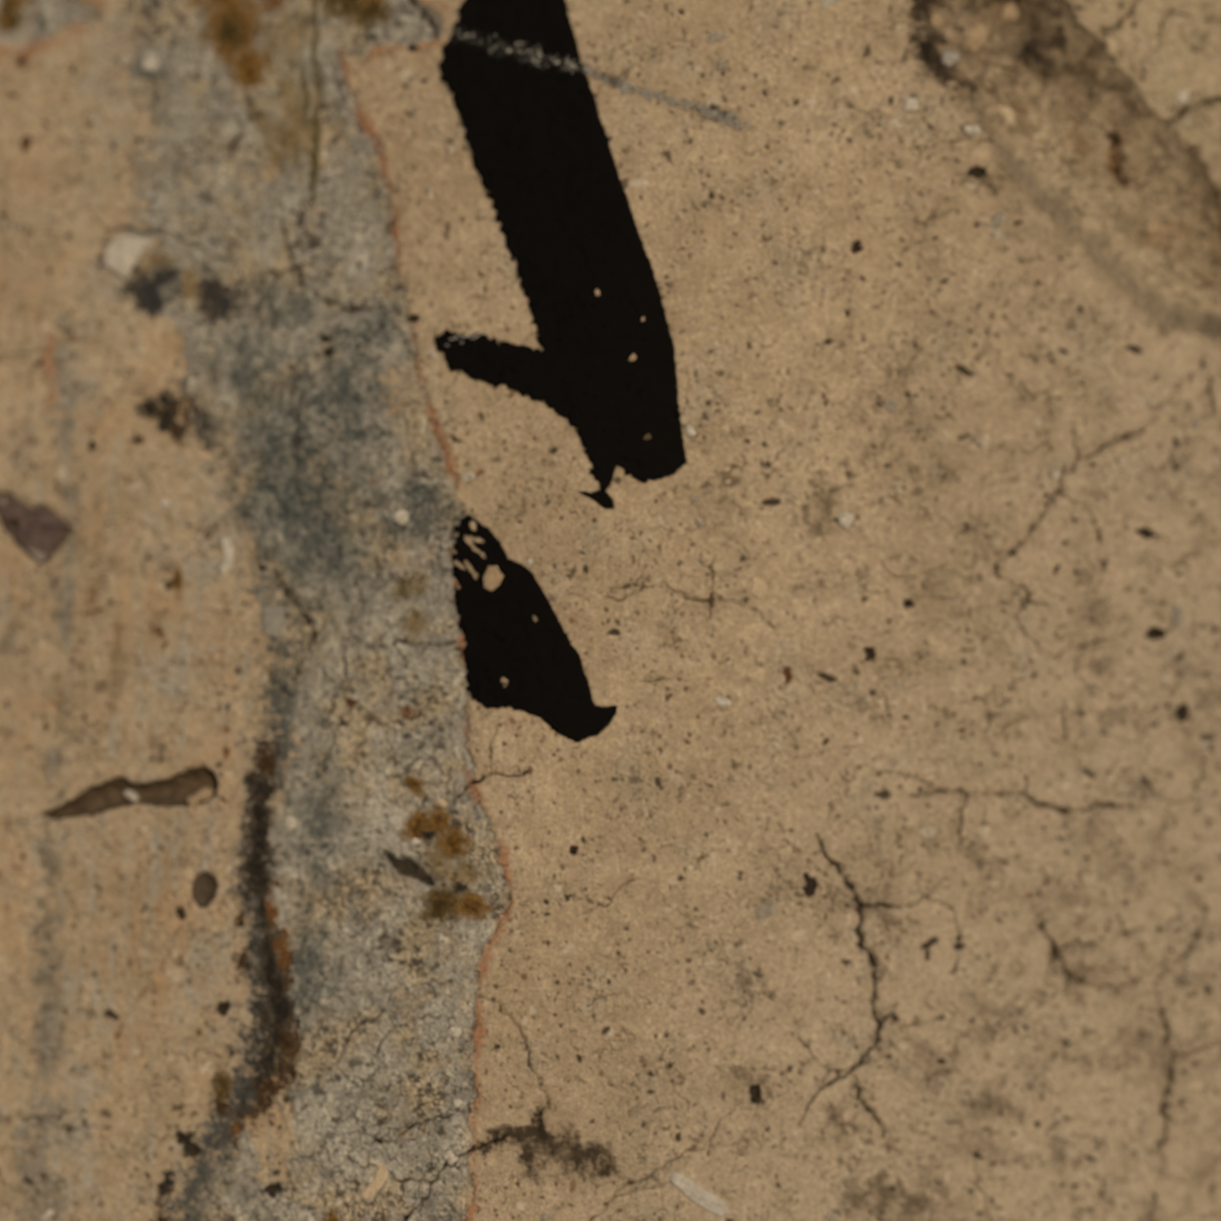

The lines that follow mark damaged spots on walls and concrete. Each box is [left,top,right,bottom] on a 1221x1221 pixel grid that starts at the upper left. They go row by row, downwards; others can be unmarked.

water stain [135,388,224,452]
water stain [123,263,244,327]
flaking render [102,0,512,1221]
spalling [910,0,1221,337]
crack [995,417,1158,679]
spalling [41,767,218,820]
crack [798,836,961,1137]
water stain [473,1106,555,1153]